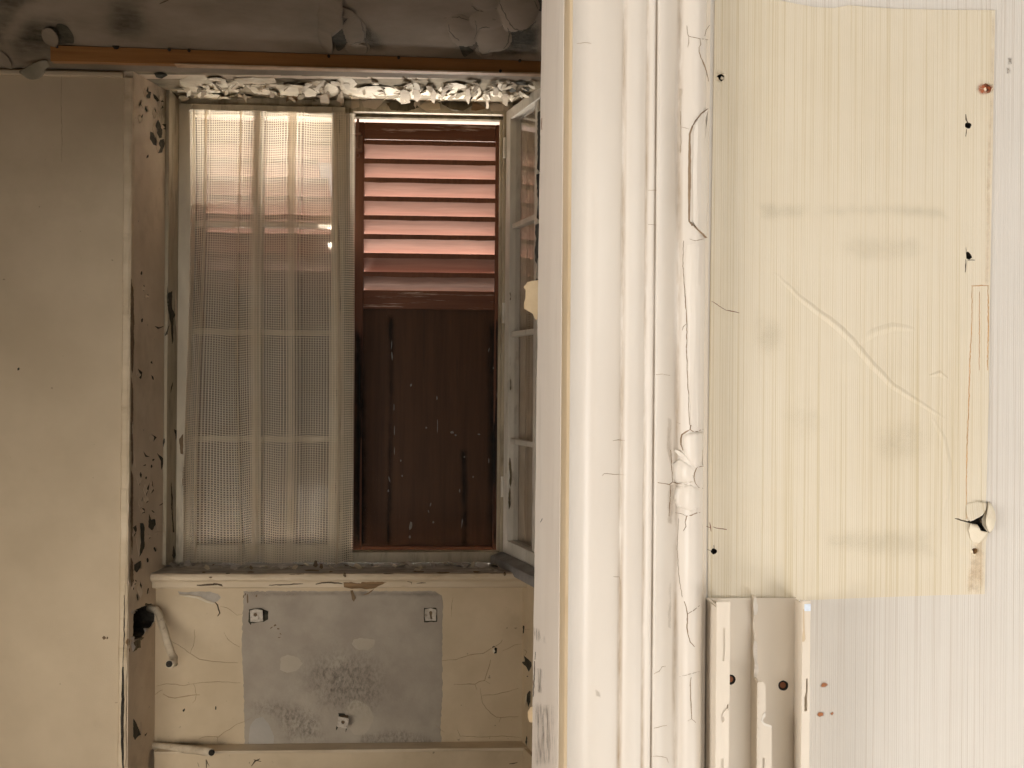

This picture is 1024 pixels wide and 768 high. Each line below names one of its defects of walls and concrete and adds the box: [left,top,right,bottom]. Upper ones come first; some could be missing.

crack [687,25,710,81]
peeling [138,72,535,158]
peeling [126,271,183,652]
crack [654,239,703,728]
crack [155,583,242,700]